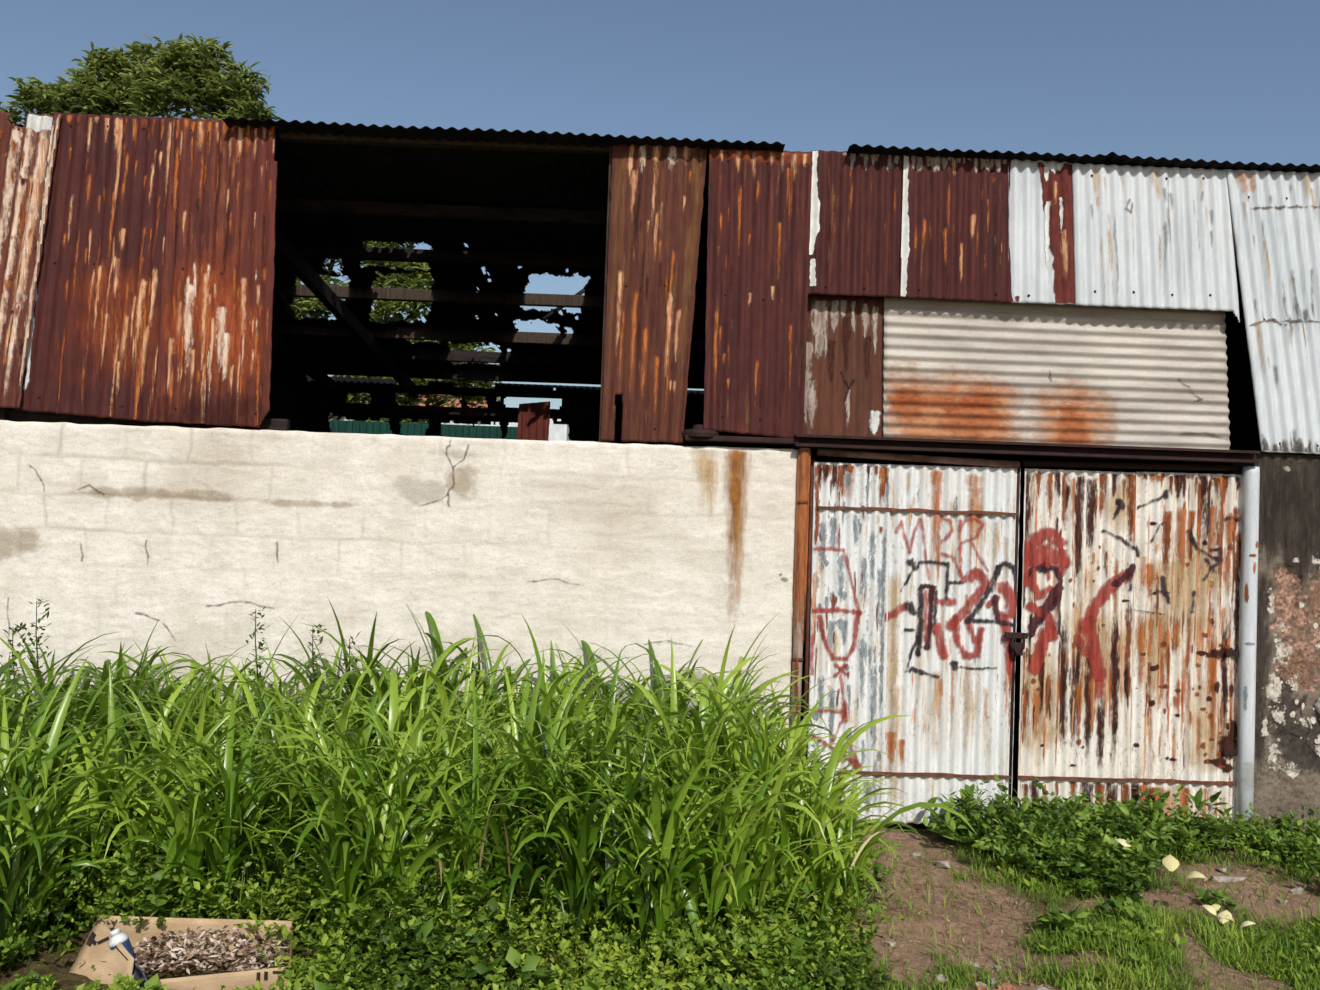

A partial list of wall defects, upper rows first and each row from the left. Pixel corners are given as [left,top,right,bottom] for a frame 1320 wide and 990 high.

rust [63,115,274,425]
rust [608,144,702,404]
rust [714,150,807,430]
rust [1037,162,1075,303]
crack [424,444,469,505]
rust [729,450,746,555]
rust [889,379,1015,441]
rust [1042,391,1105,445]
peeling [1244,541,1259,603]
leakage [1254,437,1320,596]
leakage [1255,576,1320,772]
spalling [1261,555,1320,779]